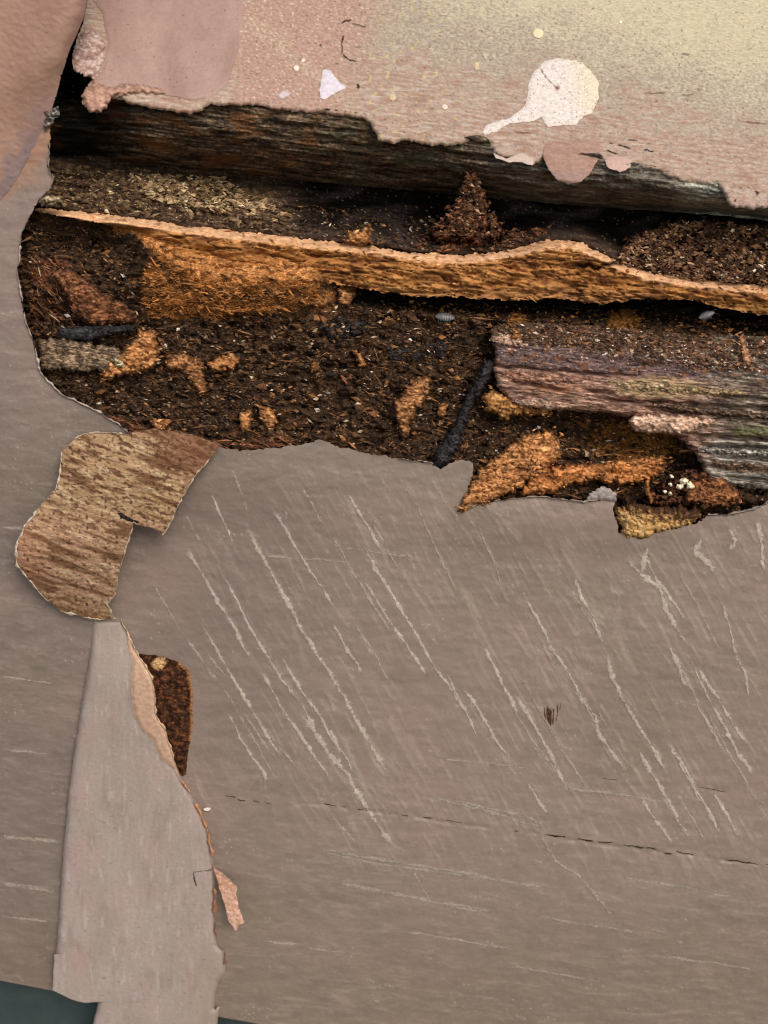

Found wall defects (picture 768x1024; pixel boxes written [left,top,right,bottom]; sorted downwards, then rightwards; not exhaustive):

peeling [43,15,166,131]
spalling [17,155,768,463]
spalling [436,371,702,533]
spalling [670,486,768,526]
peeling [14,421,244,1024]
crack [547,834,693,855]